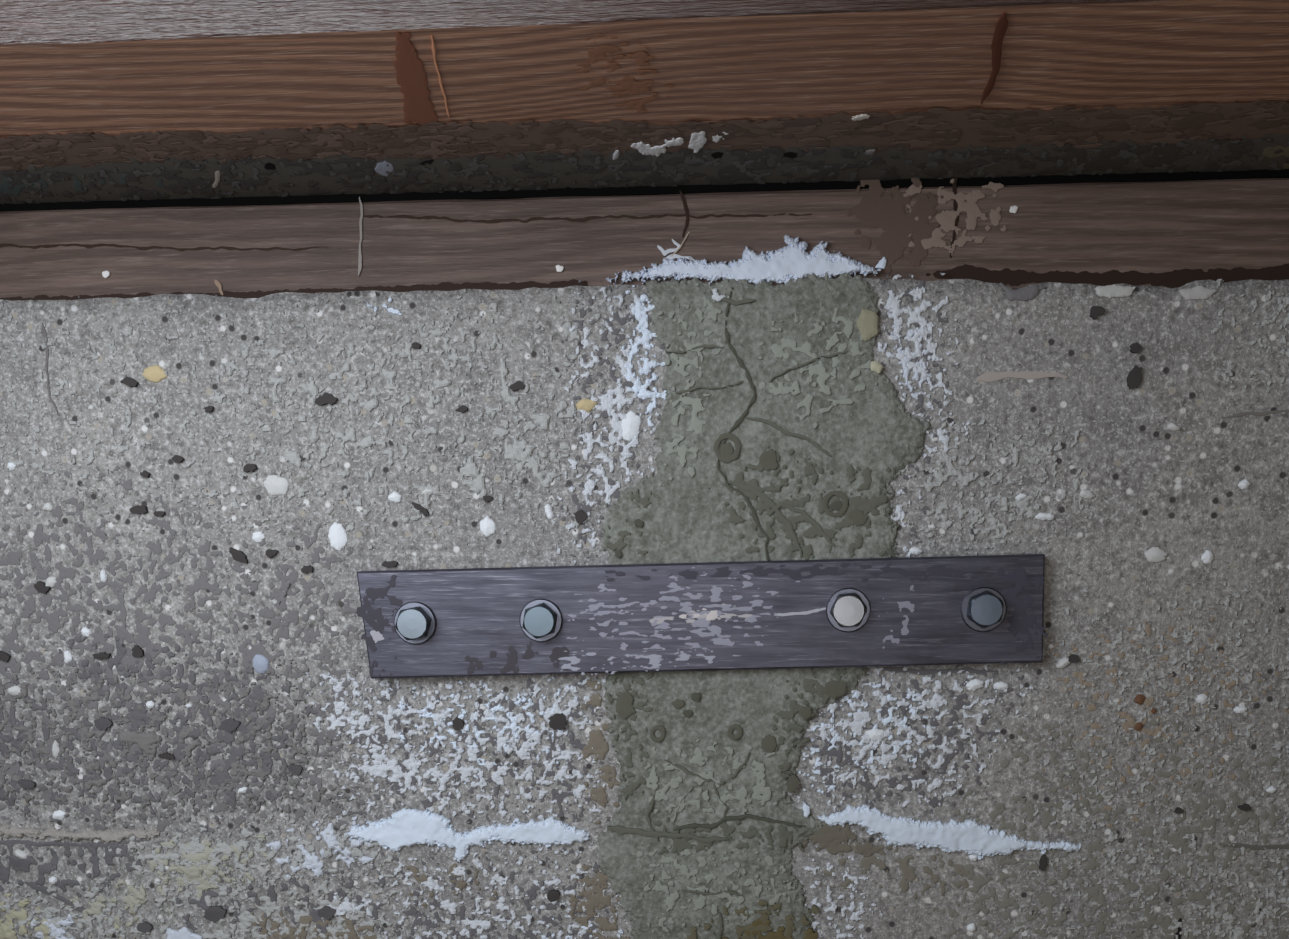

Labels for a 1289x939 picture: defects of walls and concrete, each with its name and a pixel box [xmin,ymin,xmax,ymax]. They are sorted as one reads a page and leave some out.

damp [0,12,1289,565]
damp [0,369,1289,939]
crack [607,753,806,843]
crack [665,287,848,560]